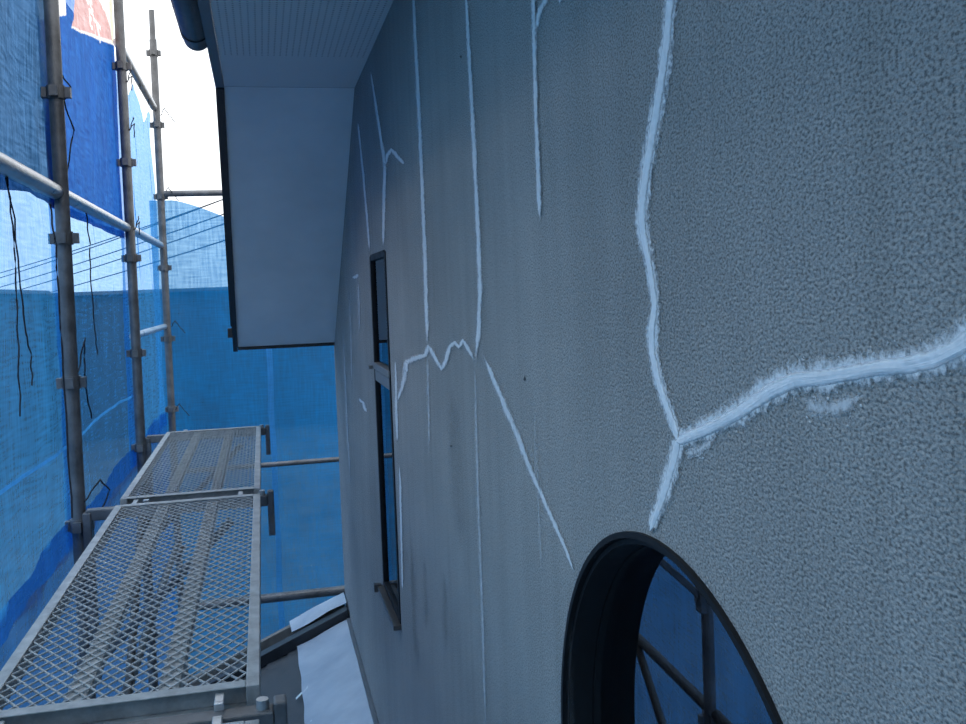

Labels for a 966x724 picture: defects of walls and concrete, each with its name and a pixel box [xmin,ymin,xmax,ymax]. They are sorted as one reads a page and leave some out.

crack [344,274,367,466]
crack [358,0,573,569]
crack [635,0,966,531]
crack [397,466,405,591]
crack [475,405,485,702]